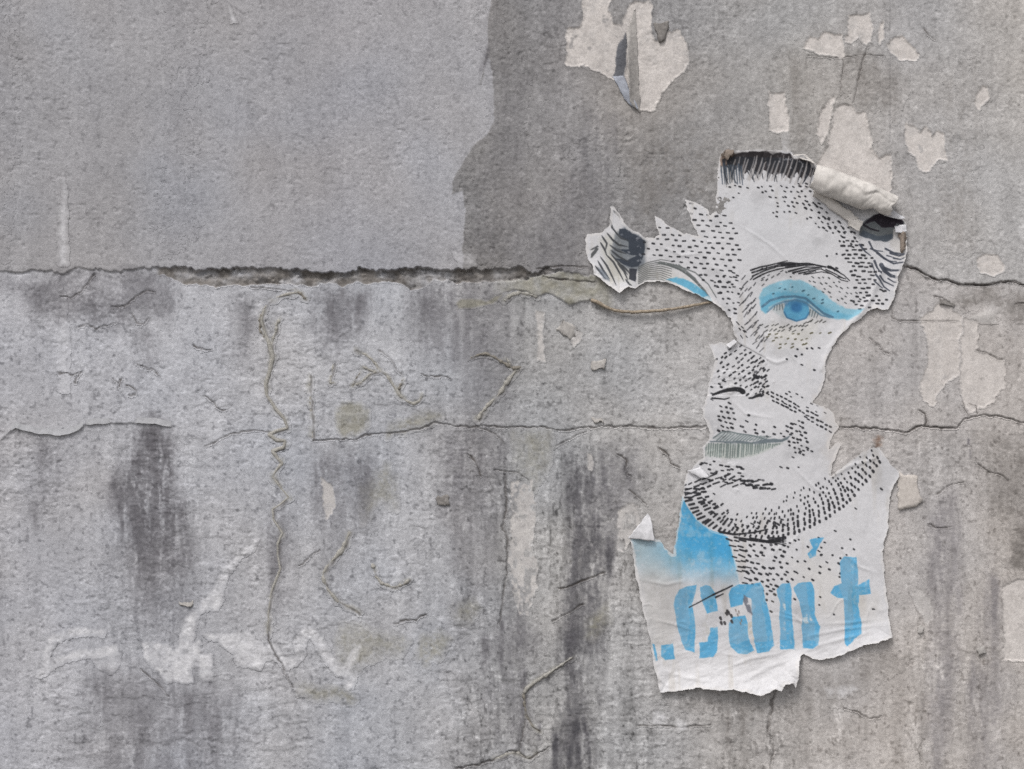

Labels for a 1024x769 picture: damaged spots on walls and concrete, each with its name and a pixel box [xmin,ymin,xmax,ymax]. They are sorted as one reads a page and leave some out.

peeling [564,0,690,113]
peeling [802,11,921,61]
peeling [766,90,790,134]
peeling [974,84,991,111]
peeling [815,94,894,192]
peeling [903,120,949,173]
crack [59,273,96,299]
crack [504,264,596,304]
peeling [918,298,1007,414]
crack [838,401,1024,435]
damp [97,407,207,643]
damp [402,280,655,769]